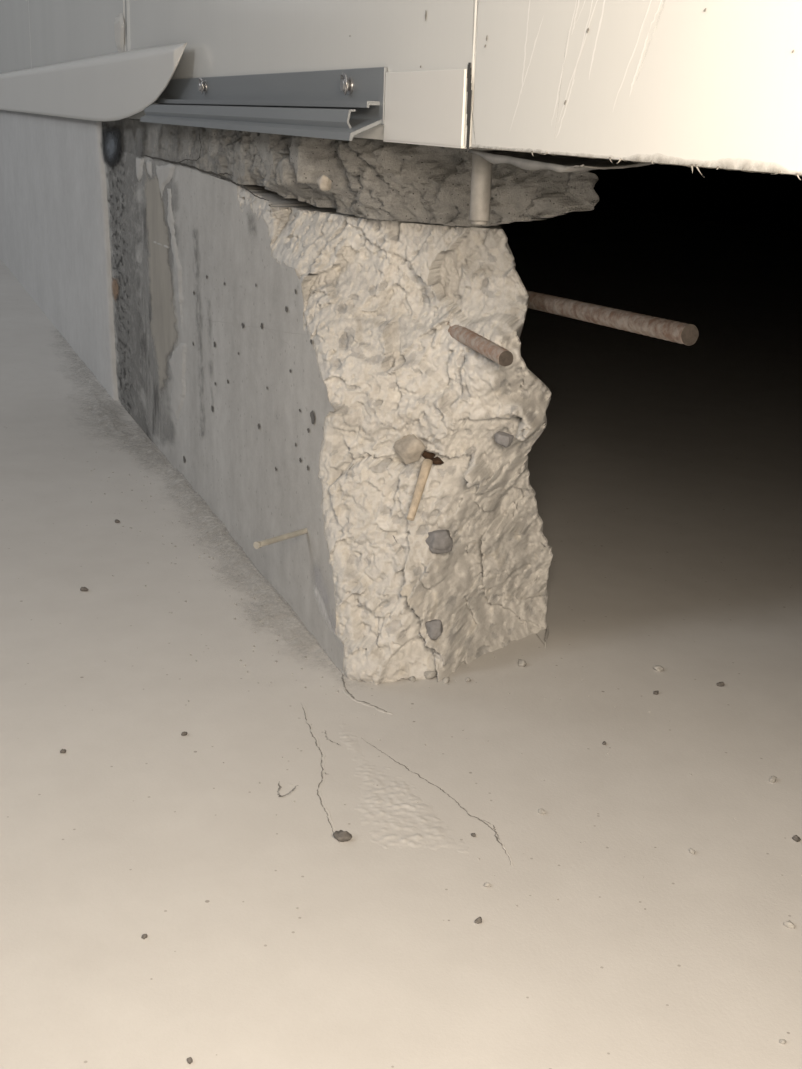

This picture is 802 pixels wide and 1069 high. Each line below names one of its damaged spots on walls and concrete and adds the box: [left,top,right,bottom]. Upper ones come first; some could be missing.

peeling [136,156,194,420]
spalling [237,186,699,685]
crack [341,673,392,714]
crack [302,706,513,866]